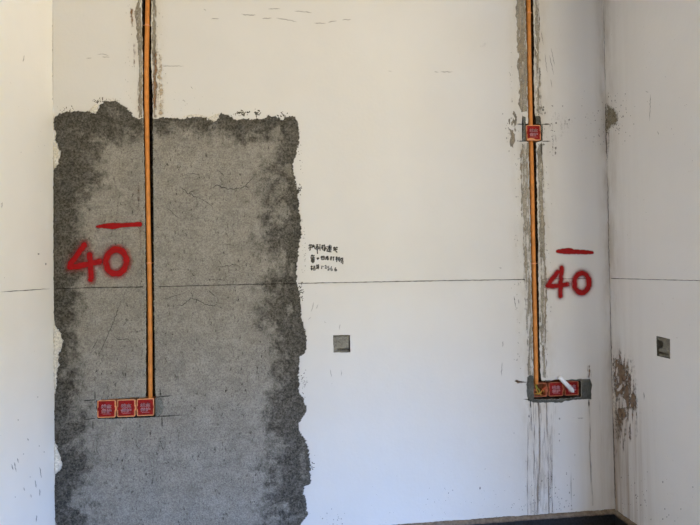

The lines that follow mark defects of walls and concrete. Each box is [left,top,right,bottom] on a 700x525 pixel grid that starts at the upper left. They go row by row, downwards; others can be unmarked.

flaking render [53,140,61,169]
crack [182,172,252,203]
flaking render [53,323,63,394]
flaking render [54,443,62,474]